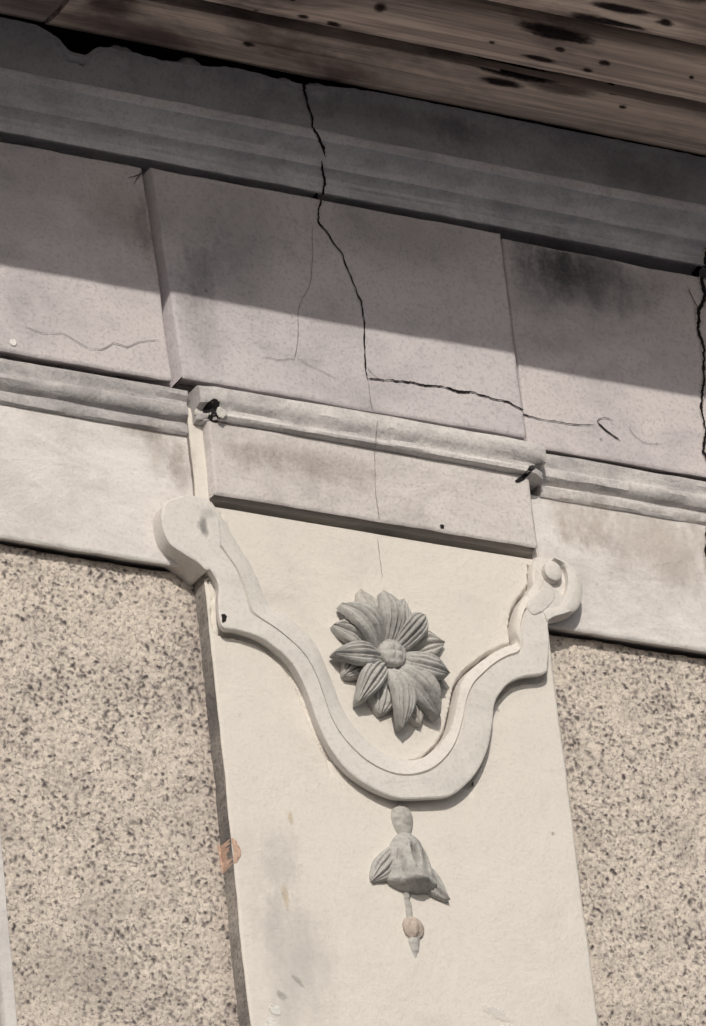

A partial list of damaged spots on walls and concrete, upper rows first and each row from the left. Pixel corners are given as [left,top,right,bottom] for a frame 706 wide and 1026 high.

crack [263,75,663,578]
crack [687,246,706,460]
crack [698,532,706,567]